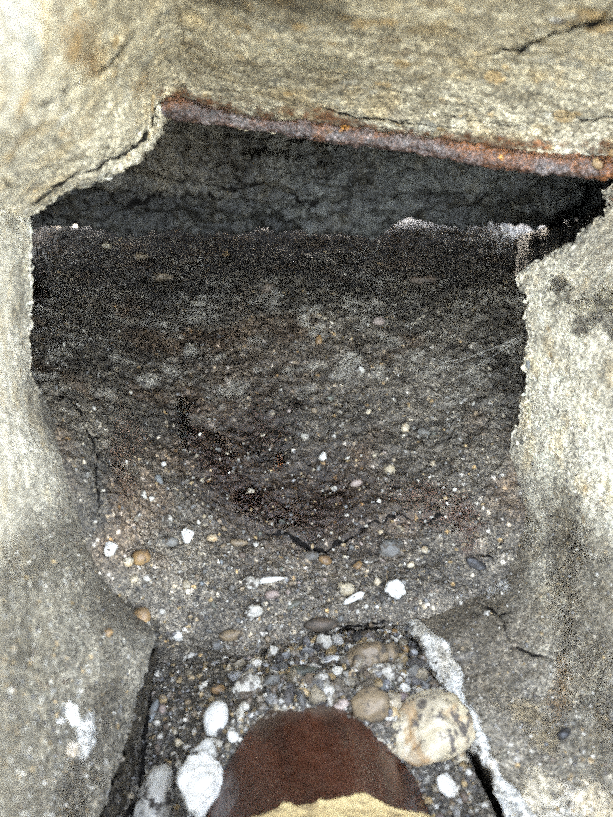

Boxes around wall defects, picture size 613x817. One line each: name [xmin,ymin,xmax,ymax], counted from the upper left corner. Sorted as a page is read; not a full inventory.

crack [488,6,613,55]
crack [39,34,136,107]
crack [30,95,340,225]
rust [161,90,613,181]
crack [267,512,505,559]
crack [483,605,554,660]
crack [124,678,153,817]